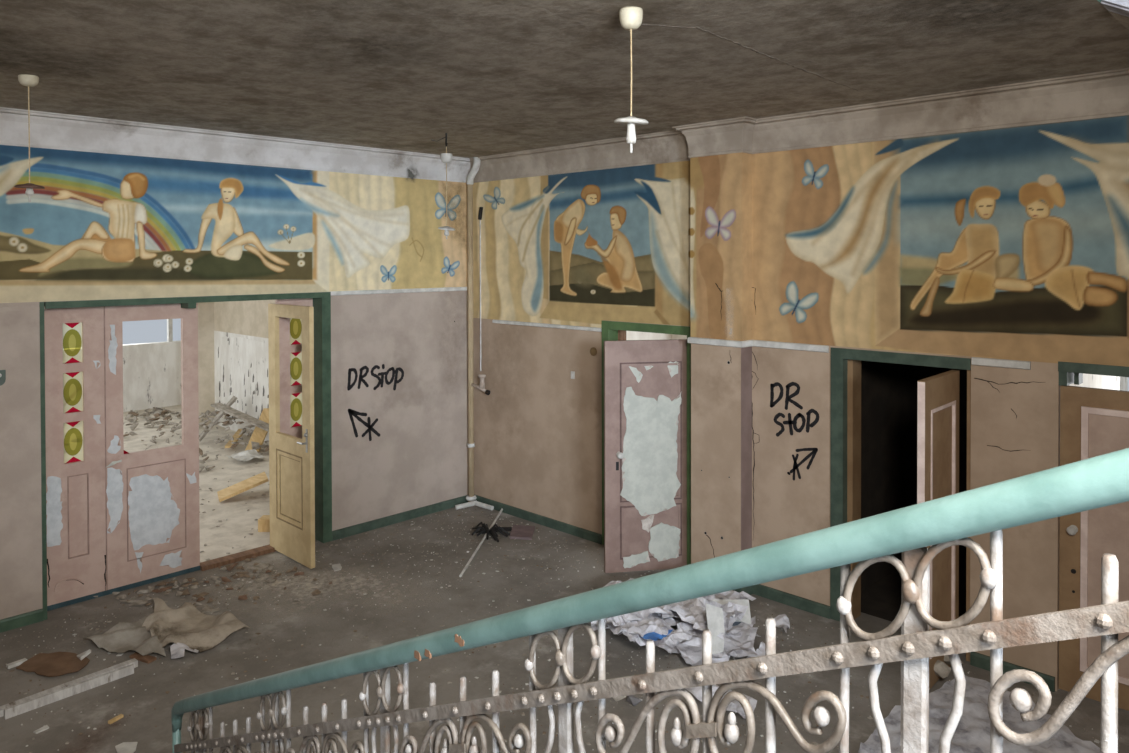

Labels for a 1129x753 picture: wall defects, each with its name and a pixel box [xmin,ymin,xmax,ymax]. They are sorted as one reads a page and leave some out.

peeling [93,325,118,375]
peeling [668,361,679,378]
crack [974,378,1044,418]
peeling [620,365,682,568]
peeling [46,476,63,547]
peeling [106,435,182,574]